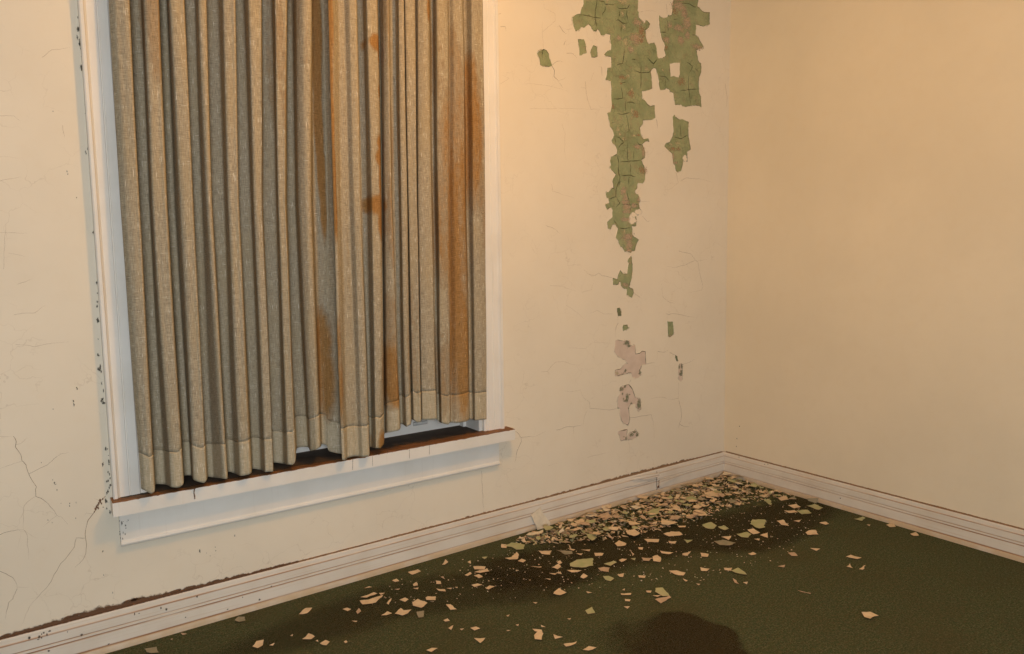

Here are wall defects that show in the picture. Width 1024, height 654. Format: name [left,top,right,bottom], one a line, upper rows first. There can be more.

peeling [536,48,553,68]
peeling [571,0,710,299]
peeling [613,307,647,442]
crack [0,436,100,619]